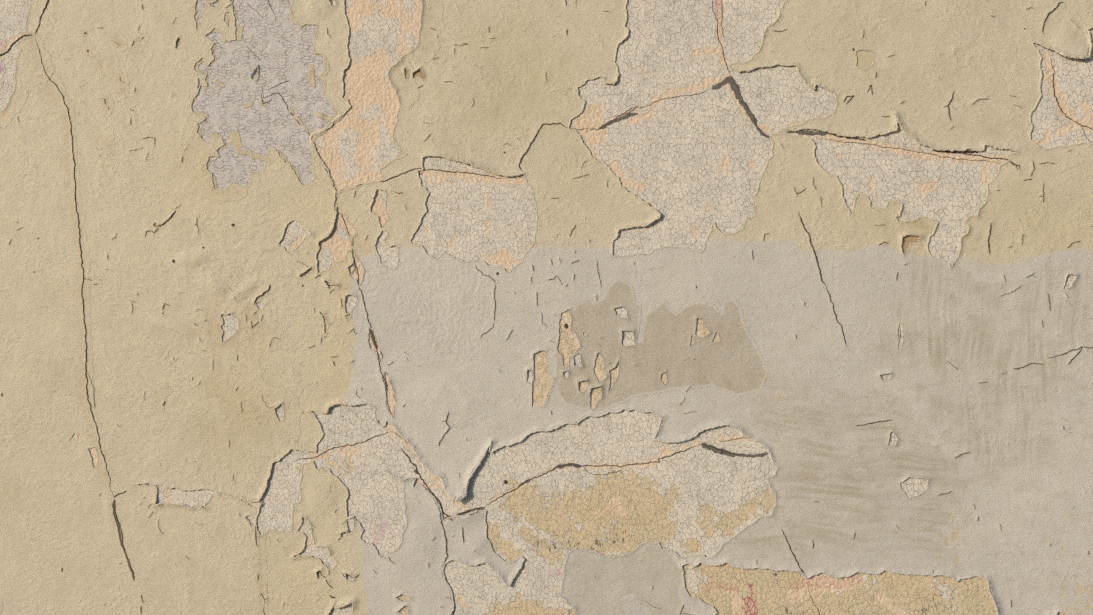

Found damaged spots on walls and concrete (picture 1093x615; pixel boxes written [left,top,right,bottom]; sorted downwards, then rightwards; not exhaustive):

peeling [0,0,35,113]
peeling [277,0,539,320]
peeling [131,306,1001,615]
crack [261,0,1093,615]
peeling [568,0,1019,269]
peeling [1028,25,1093,151]